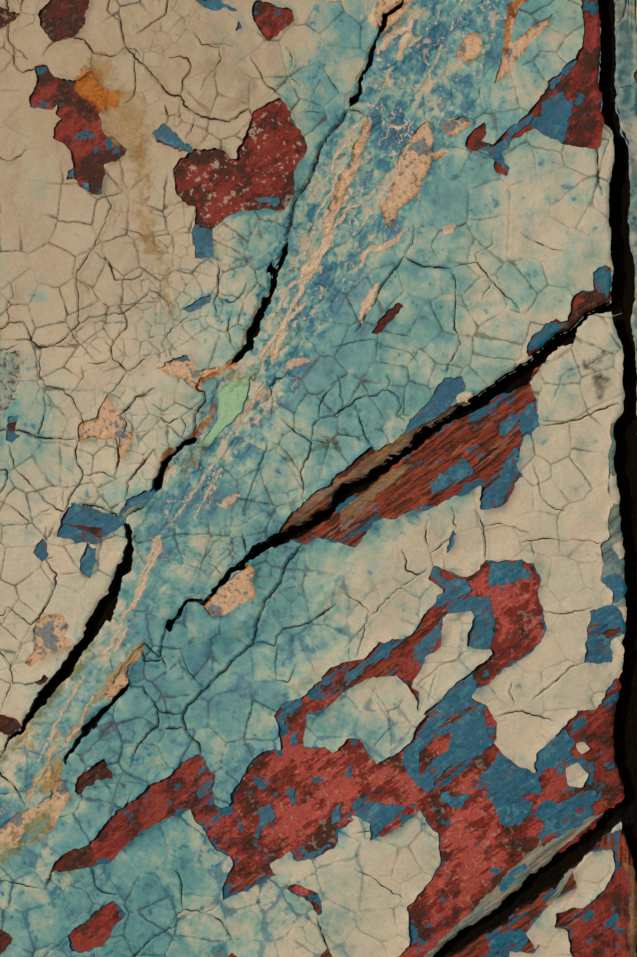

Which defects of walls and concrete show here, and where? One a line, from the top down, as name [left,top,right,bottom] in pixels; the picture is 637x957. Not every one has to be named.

peeling [30,65,127,195]
corrosion [75,61,145,157]
peeling [152,99,308,259]
peeling [252,1,294,41]
peeling [458,0,605,176]
peeling [527,265,612,357]
peeling [57,488,157,578]
crack [0,0,404,803]
crack [189,0,637,957]
peeling [292,360,549,547]
peeling [584,423,627,664]
peeling [51,559,637,957]